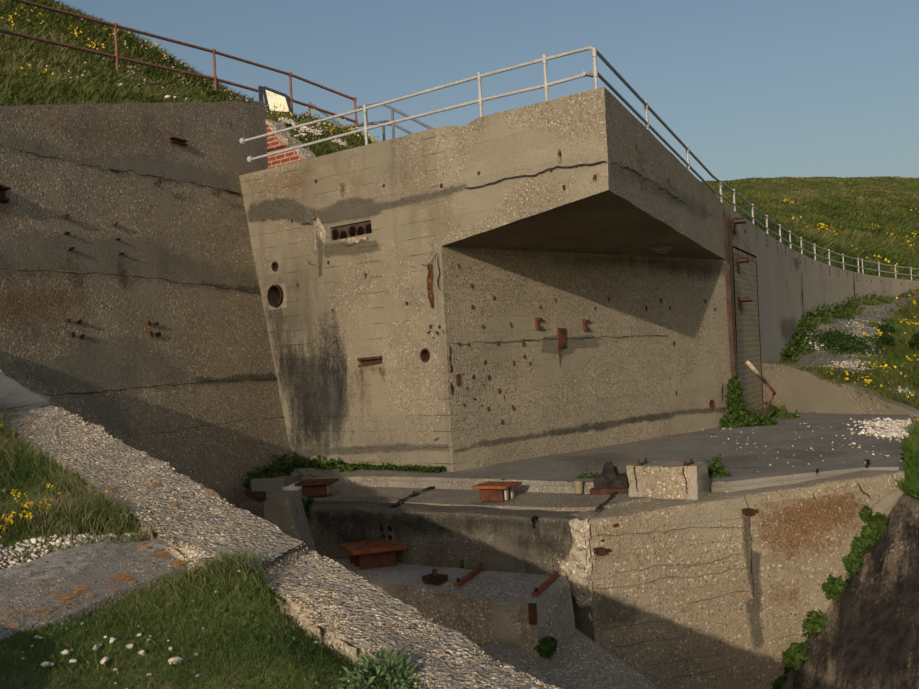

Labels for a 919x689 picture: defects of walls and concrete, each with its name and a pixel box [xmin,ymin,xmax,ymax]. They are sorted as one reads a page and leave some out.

crack [0,144,241,195]
water stain [247,185,465,224]
crack [465,161,686,204]
crack [0,255,262,295]
water stain [195,350,344,442]
spalling [558,492,618,623]
corrosion [760,494,861,559]
water stain [869,504,919,579]